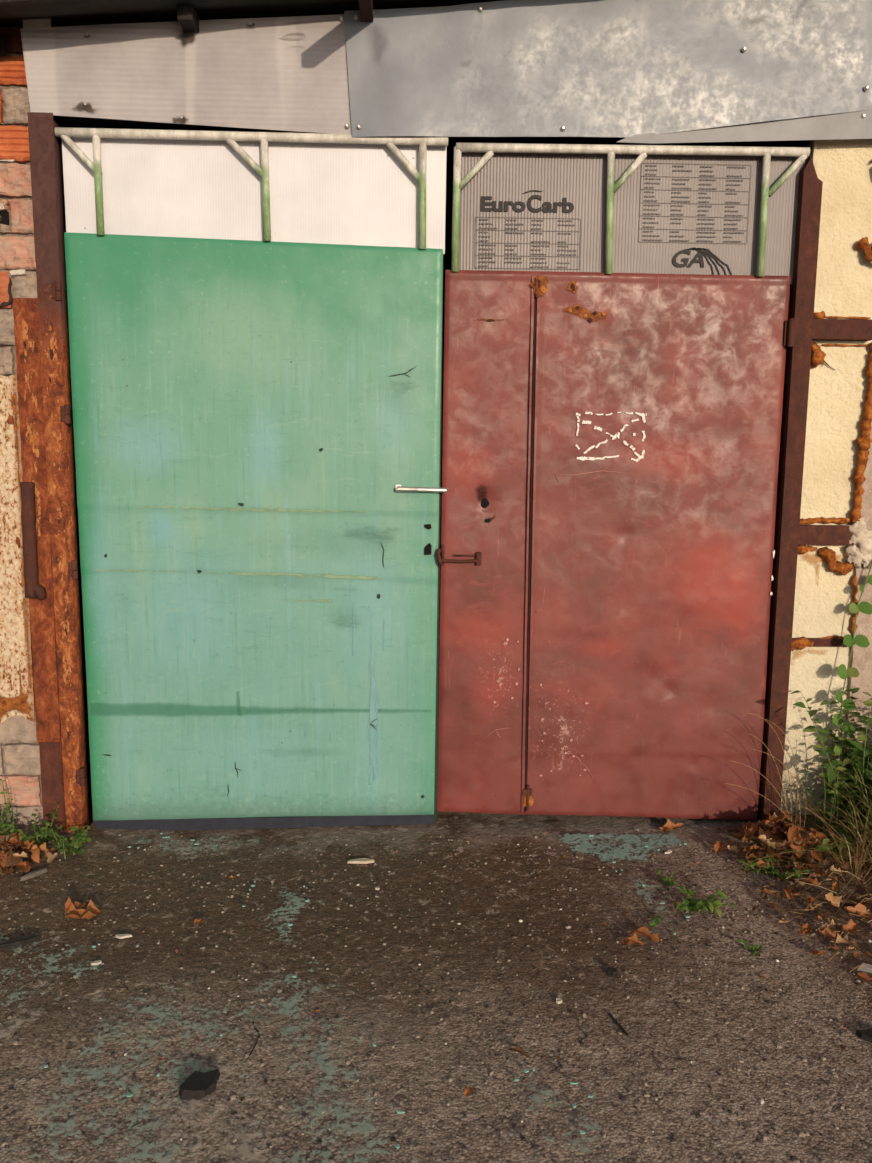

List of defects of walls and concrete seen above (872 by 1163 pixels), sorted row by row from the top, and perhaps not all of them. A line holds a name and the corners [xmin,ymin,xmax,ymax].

rust [563,281,607,323]
rust [6,318,62,536]
rust [0,516,31,717]
rust [56,507,72,686]